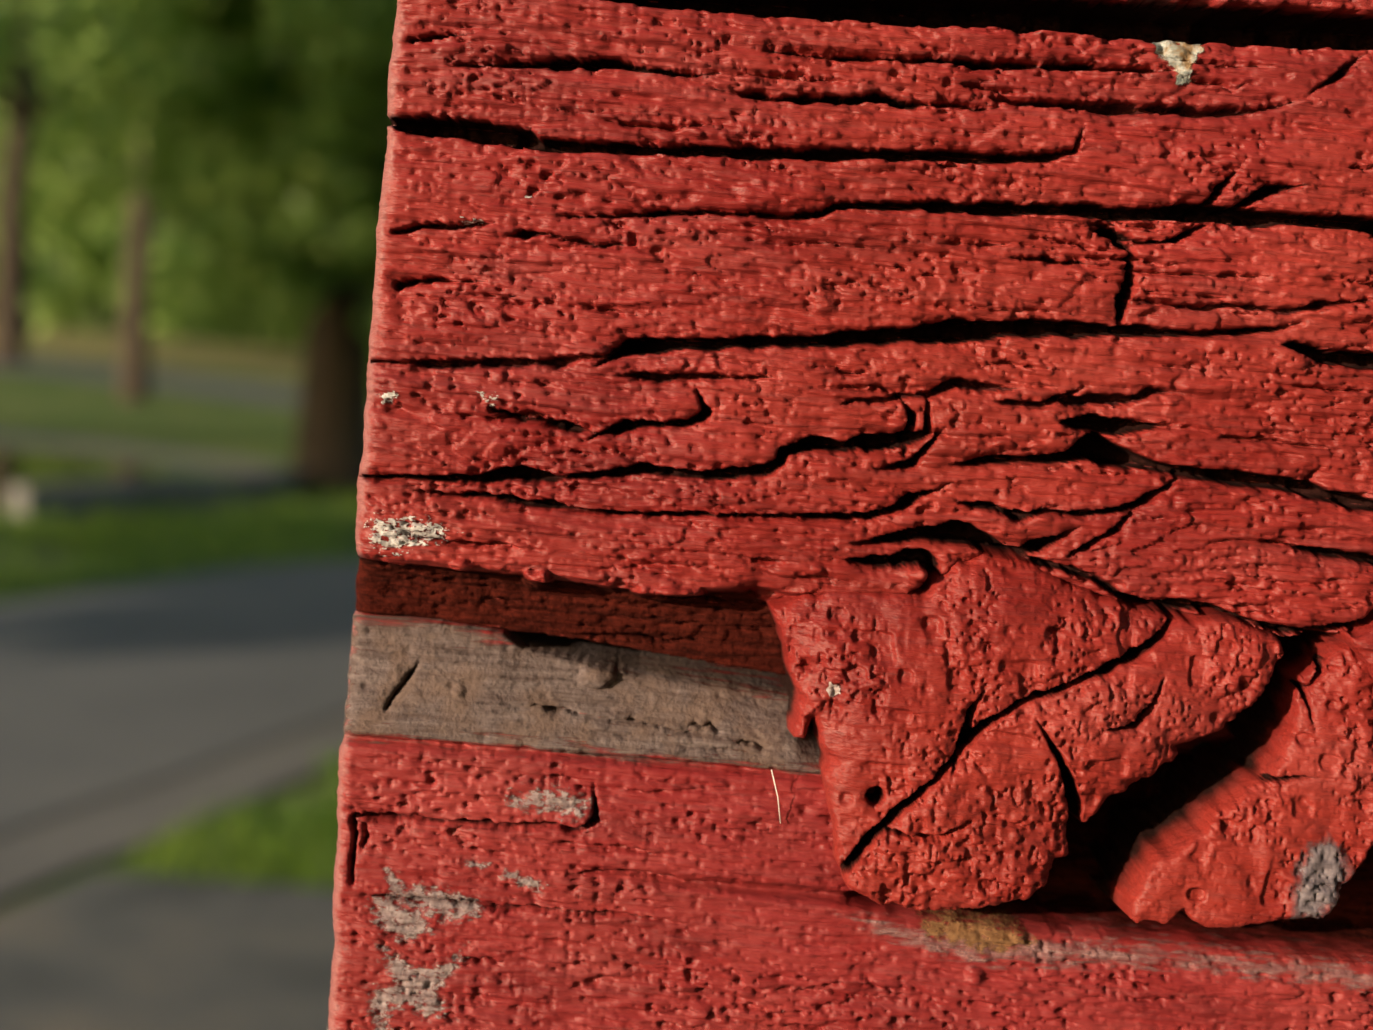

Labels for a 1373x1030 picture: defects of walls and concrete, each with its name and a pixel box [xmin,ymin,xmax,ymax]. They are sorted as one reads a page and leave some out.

crack [389,0,1373,164]
peeling [1153,40,1204,85]
crack [374,177,1373,439]
peeling [363,510,464,557]
crack [361,379,1373,633]
peeling [366,867,484,1030]
peeling [1292,842,1345,919]